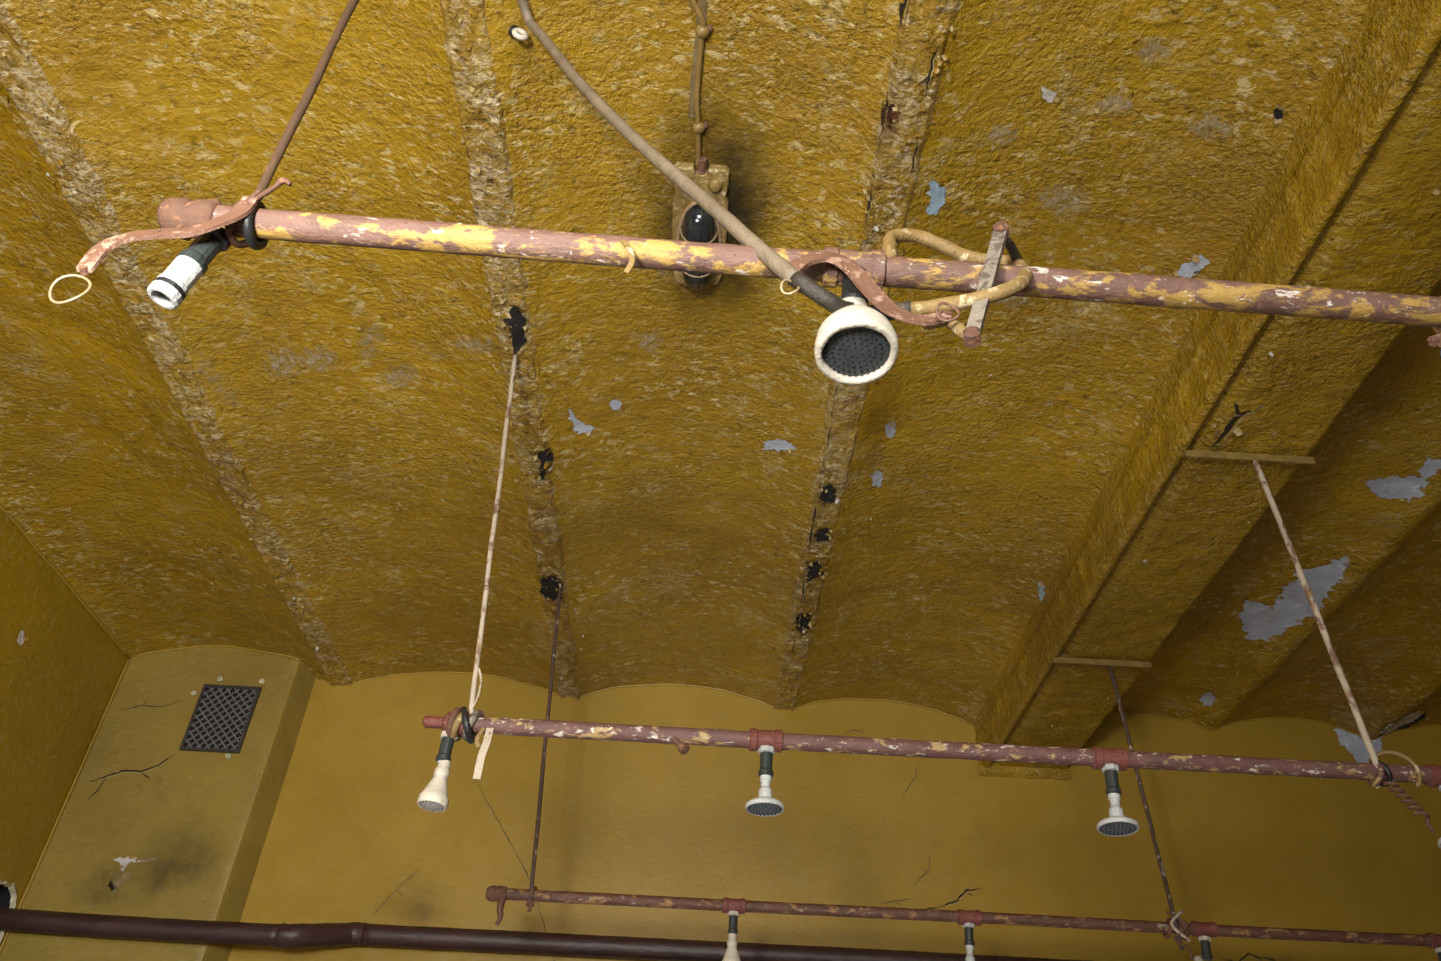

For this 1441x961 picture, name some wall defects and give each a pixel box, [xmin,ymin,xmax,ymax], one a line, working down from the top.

peeling [872,3,957,154]
peeling [452,86,493,177]
peeling [861,168,952,250]
peeling [1173,255,1210,278]
peeling [1363,458,1441,502]
peeling [1239,556,1350,644]
crack [89,753,176,798]
peeling [1333,710,1429,763]